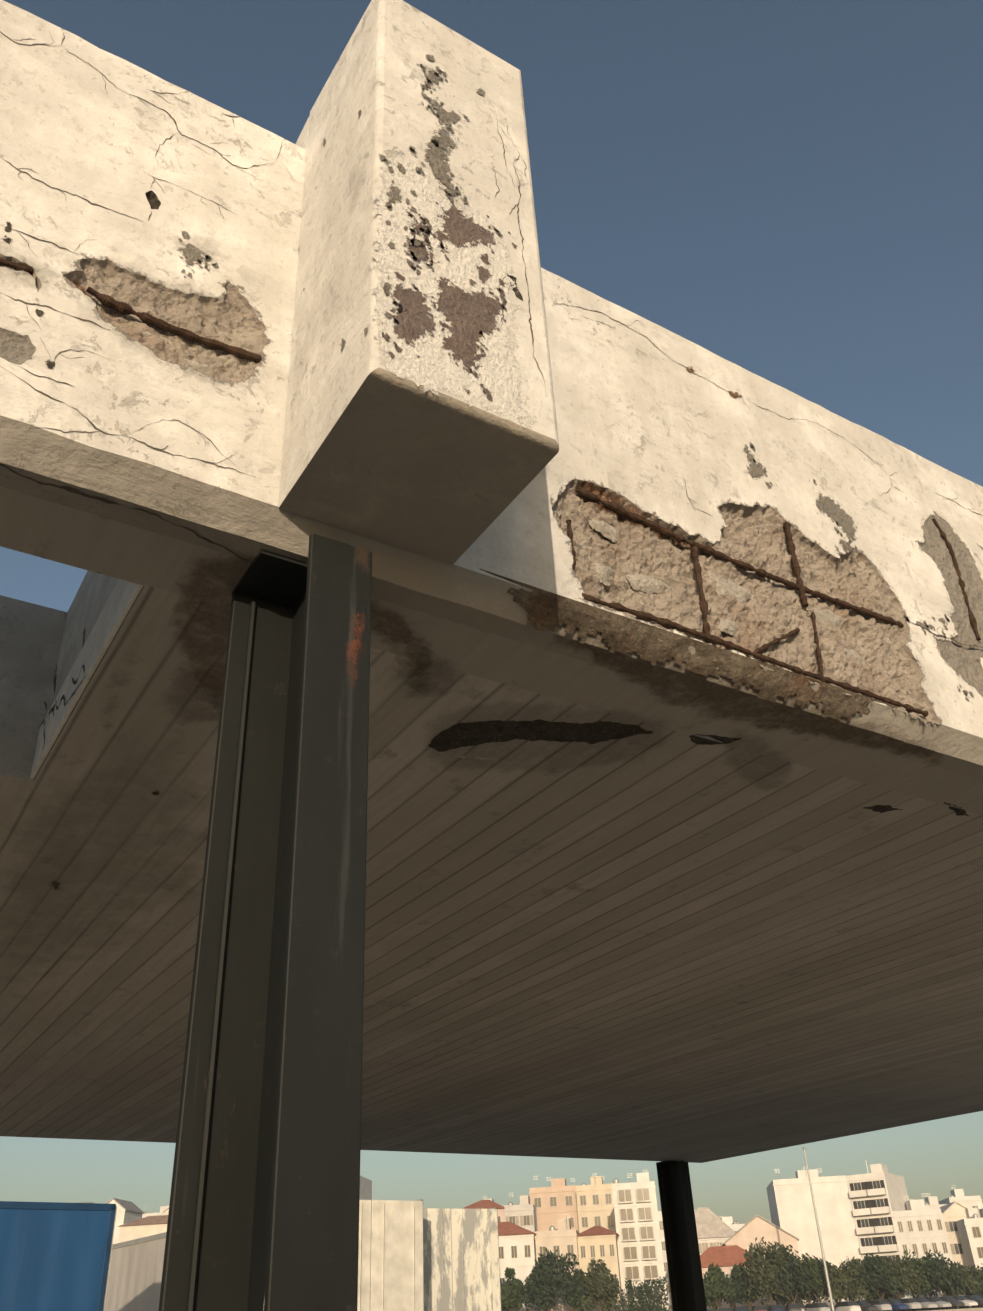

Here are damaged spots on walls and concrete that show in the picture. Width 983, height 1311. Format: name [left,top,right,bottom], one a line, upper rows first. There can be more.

crack [0,31,293,221]
spalling [0,222,42,291]
spalling [0,327,55,368]
crack [0,292,254,477]
spalling [61,231,273,387]
peeling [364,54,538,430]
crack [491,121,903,494]
spalling [480,442,983,727]
spalling [428,719,653,760]
spalling [689,734,742,745]